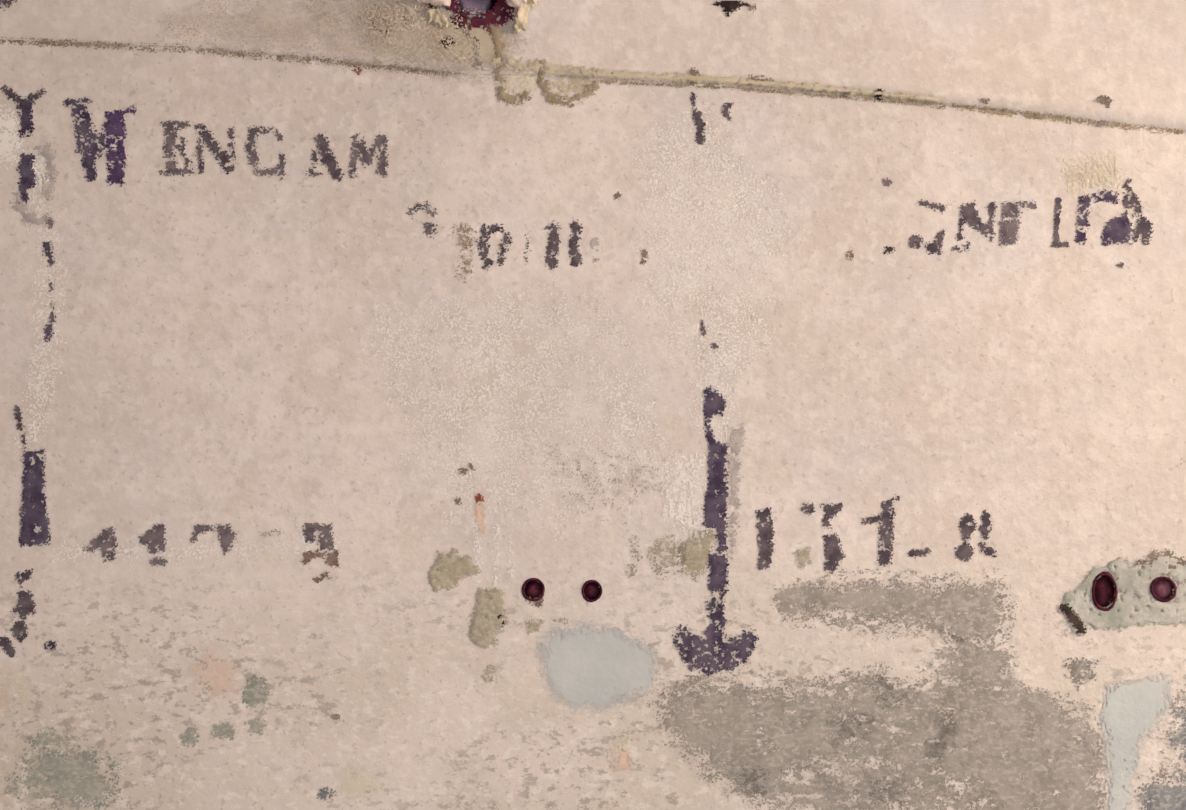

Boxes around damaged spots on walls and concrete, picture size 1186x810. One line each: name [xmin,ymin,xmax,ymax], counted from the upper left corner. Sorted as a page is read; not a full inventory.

peeling [417,0,601,108]